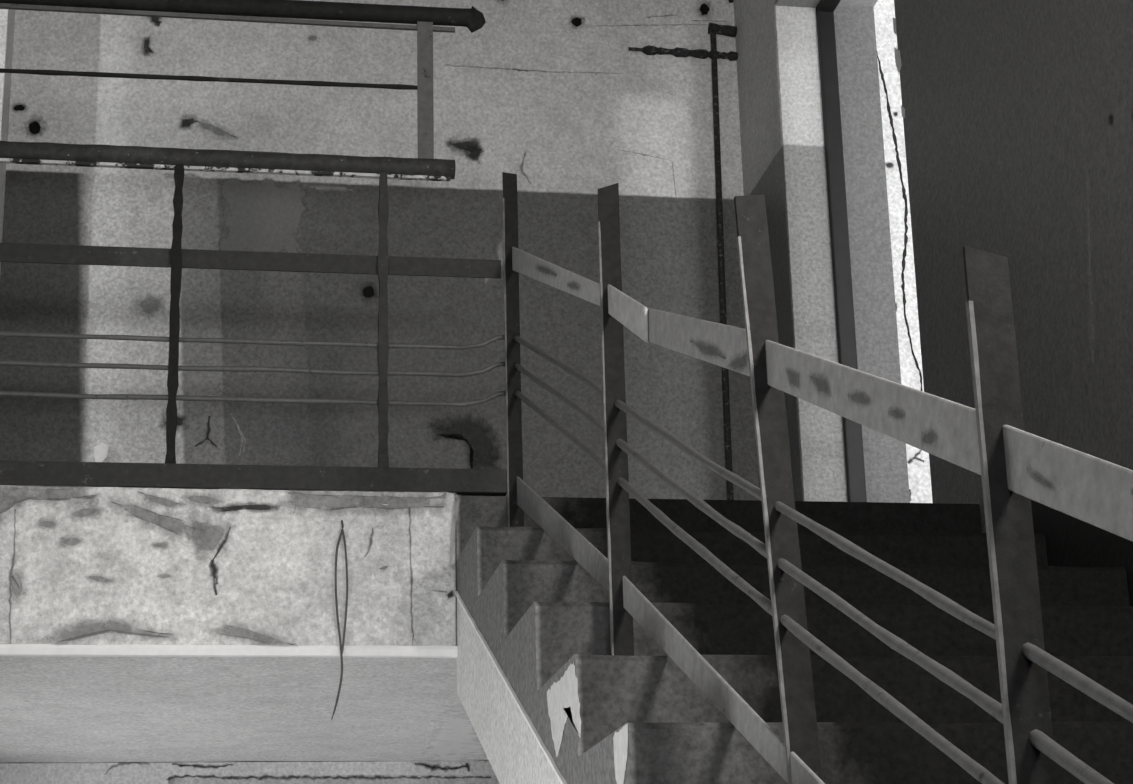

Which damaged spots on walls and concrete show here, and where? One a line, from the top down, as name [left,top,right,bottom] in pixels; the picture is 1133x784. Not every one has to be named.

crack [209,527,231,595]